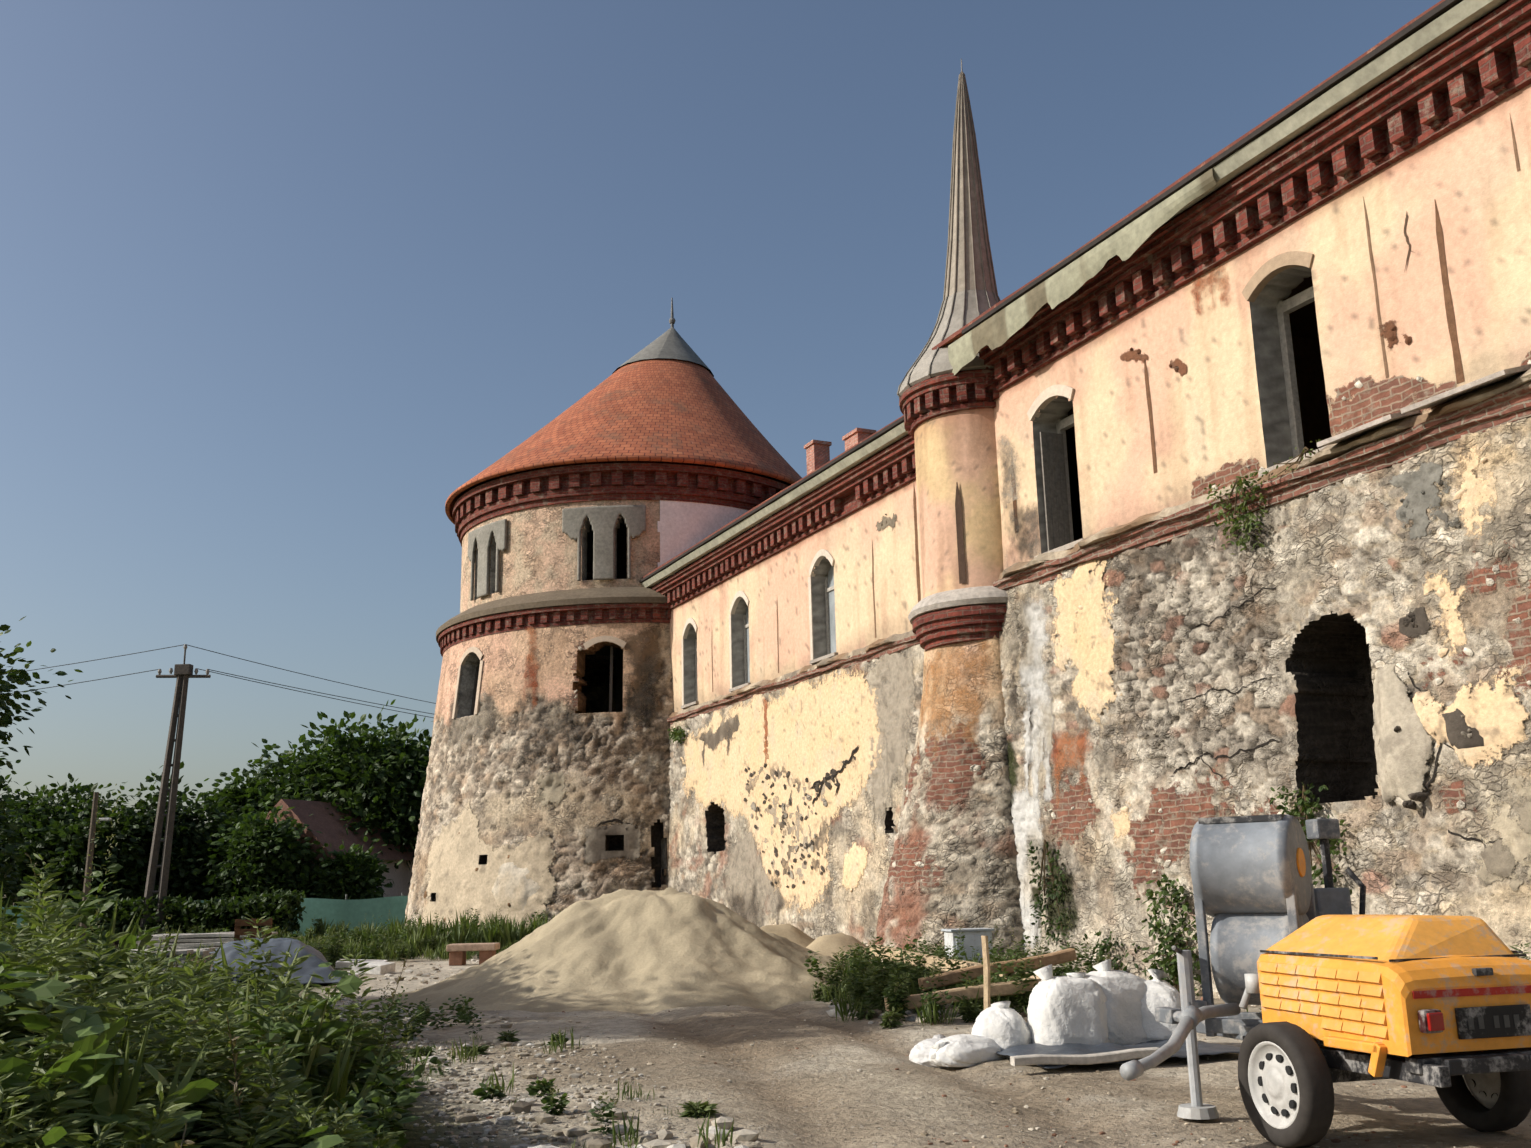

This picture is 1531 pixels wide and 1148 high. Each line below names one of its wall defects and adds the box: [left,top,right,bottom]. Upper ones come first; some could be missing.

flaking render [1326,375,1456,436]
flaking render [1191,458,1264,499]
peeling [1388,443,1531,902]
peeling [421,799,557,932]
spalling [584,823,642,864]
peeling [681,665,882,916]
flaking render [887,721,986,896]
flaking render [1044,765,1282,905]